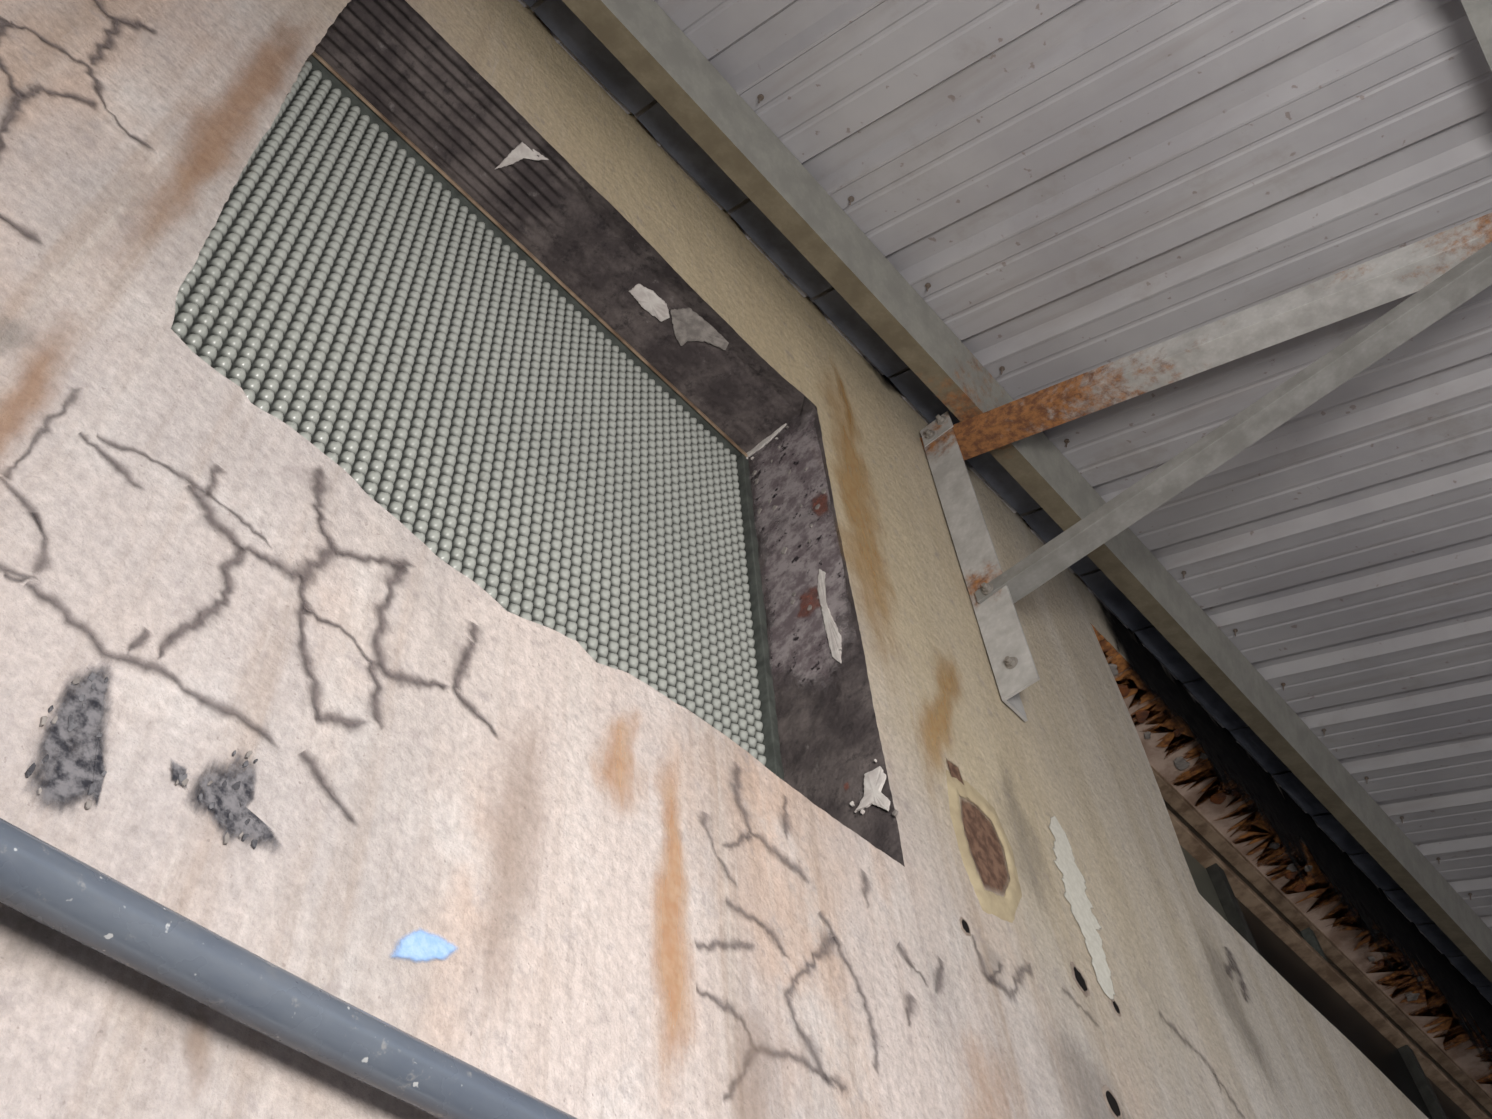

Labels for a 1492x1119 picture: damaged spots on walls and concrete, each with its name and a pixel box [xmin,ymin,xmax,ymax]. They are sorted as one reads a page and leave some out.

crack [0,0,155,150]
crack [0,214,40,242]
crack [0,395,496,821]
rust [659,797,683,1028]
crack [696,765,877,1097]
crack [898,943,943,1021]
spalling [946,759,1022,923]
rust [1090,623,1492,1084]